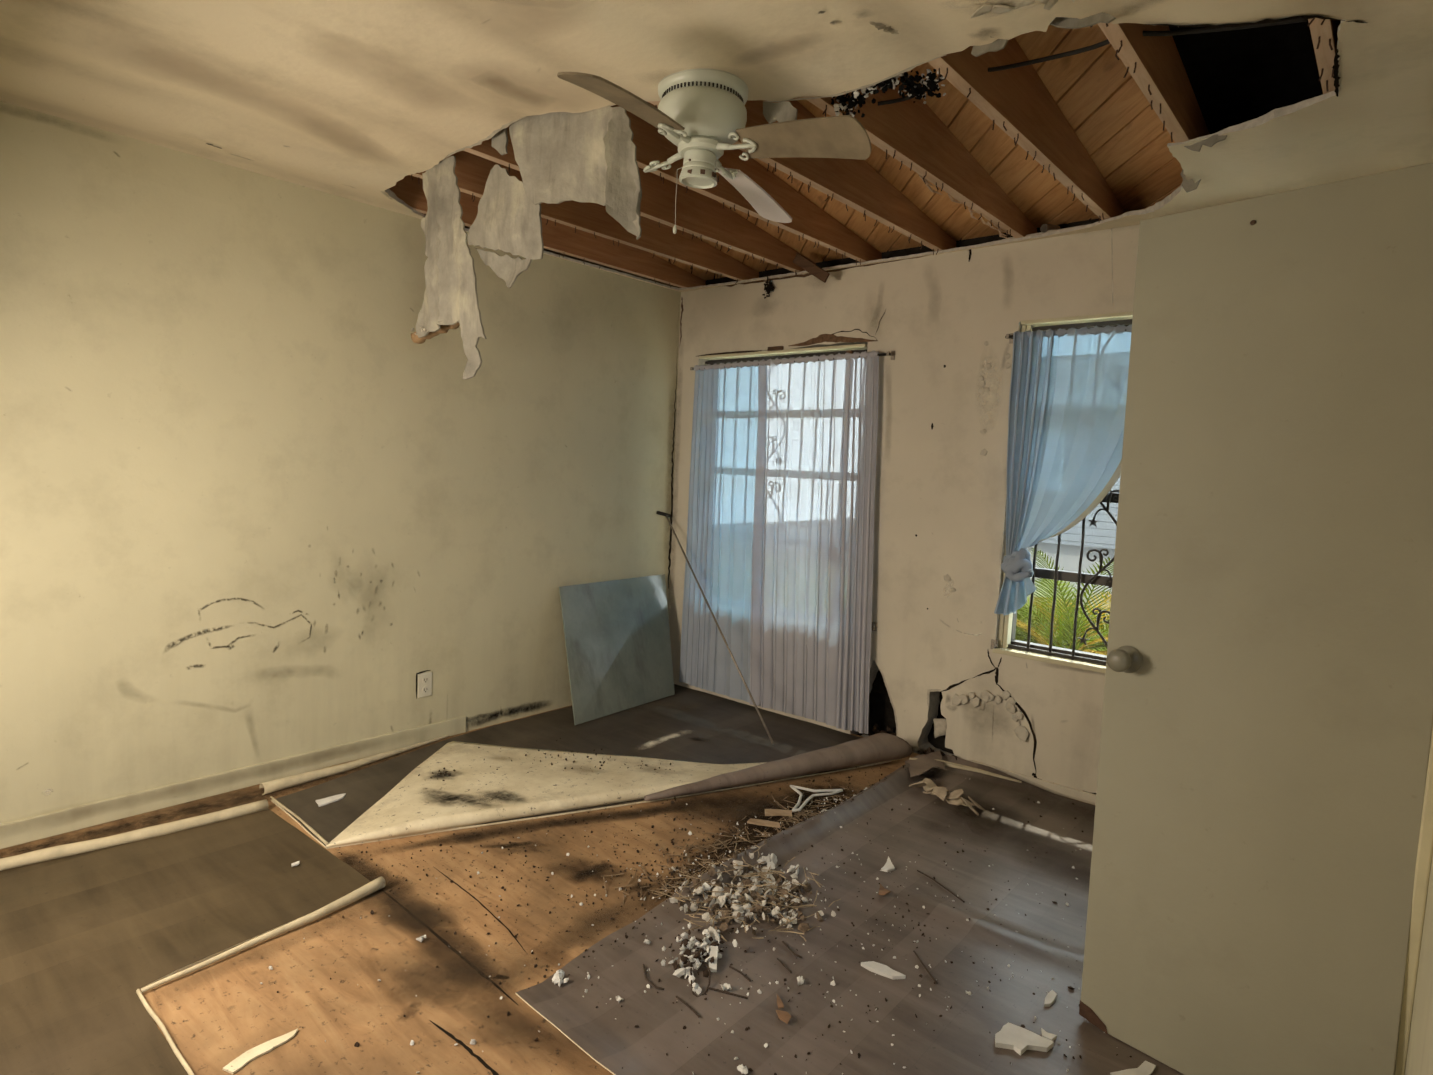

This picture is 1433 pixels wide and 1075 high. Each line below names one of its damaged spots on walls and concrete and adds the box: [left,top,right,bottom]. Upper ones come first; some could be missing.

peeling [832,69,946,117]
flaking render [696,310,886,357]
spalling [857,660,898,736]
crack [941,651,1042,780]